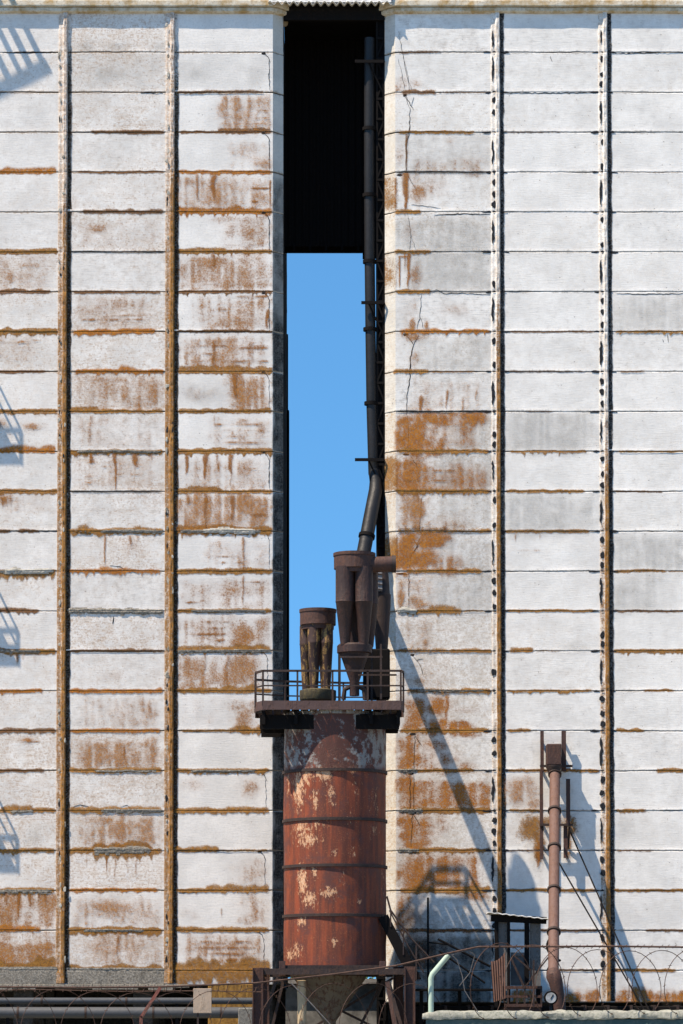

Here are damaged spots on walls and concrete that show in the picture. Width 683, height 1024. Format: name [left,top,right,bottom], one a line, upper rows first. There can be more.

corrosion [0,50,273,984]
corrosion [385,130,490,233]
crack [396,31,488,249]
corrosion [385,287,683,1002]